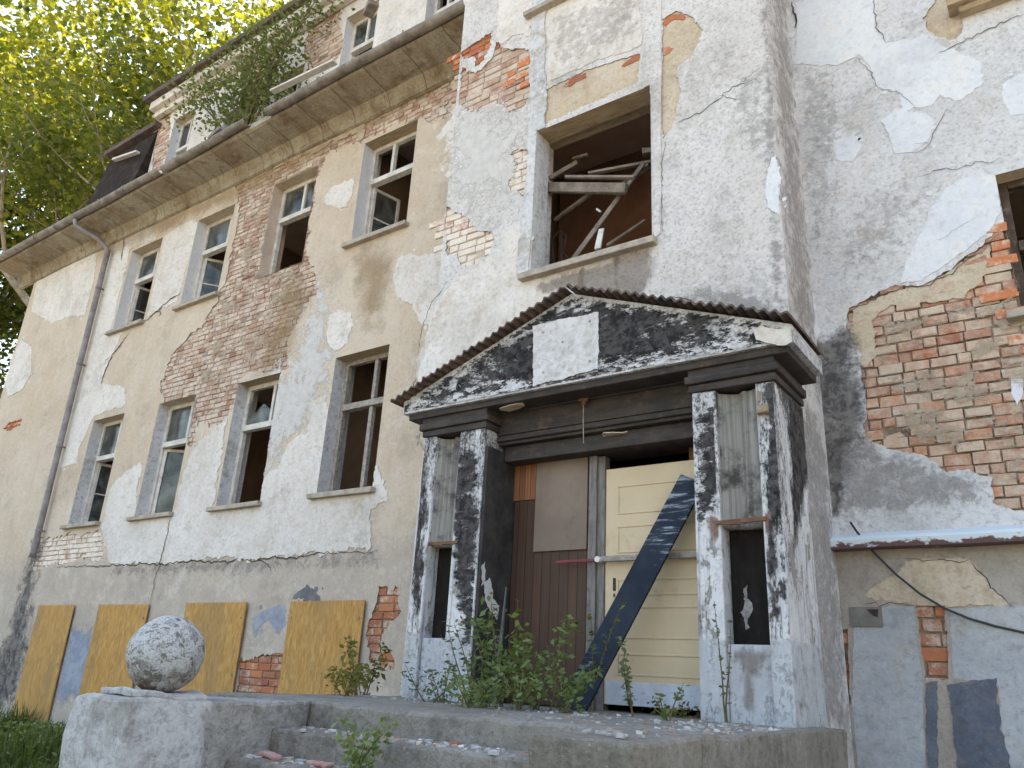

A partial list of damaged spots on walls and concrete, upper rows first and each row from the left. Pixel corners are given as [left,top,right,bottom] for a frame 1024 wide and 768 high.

spalling [661,11,703,138]
crack [679,70,757,122]
crack [940,14,1023,52]
crack [916,117,1000,177]
peeling [32,0,557,572]
damp [411,379,533,411]
damp [595,335,753,377]
damp [763,0,975,722]
flaking render [846,165,1024,511]
crack [57,520,377,602]
flaking render [365,585,401,670]
spalling [866,557,1011,768]